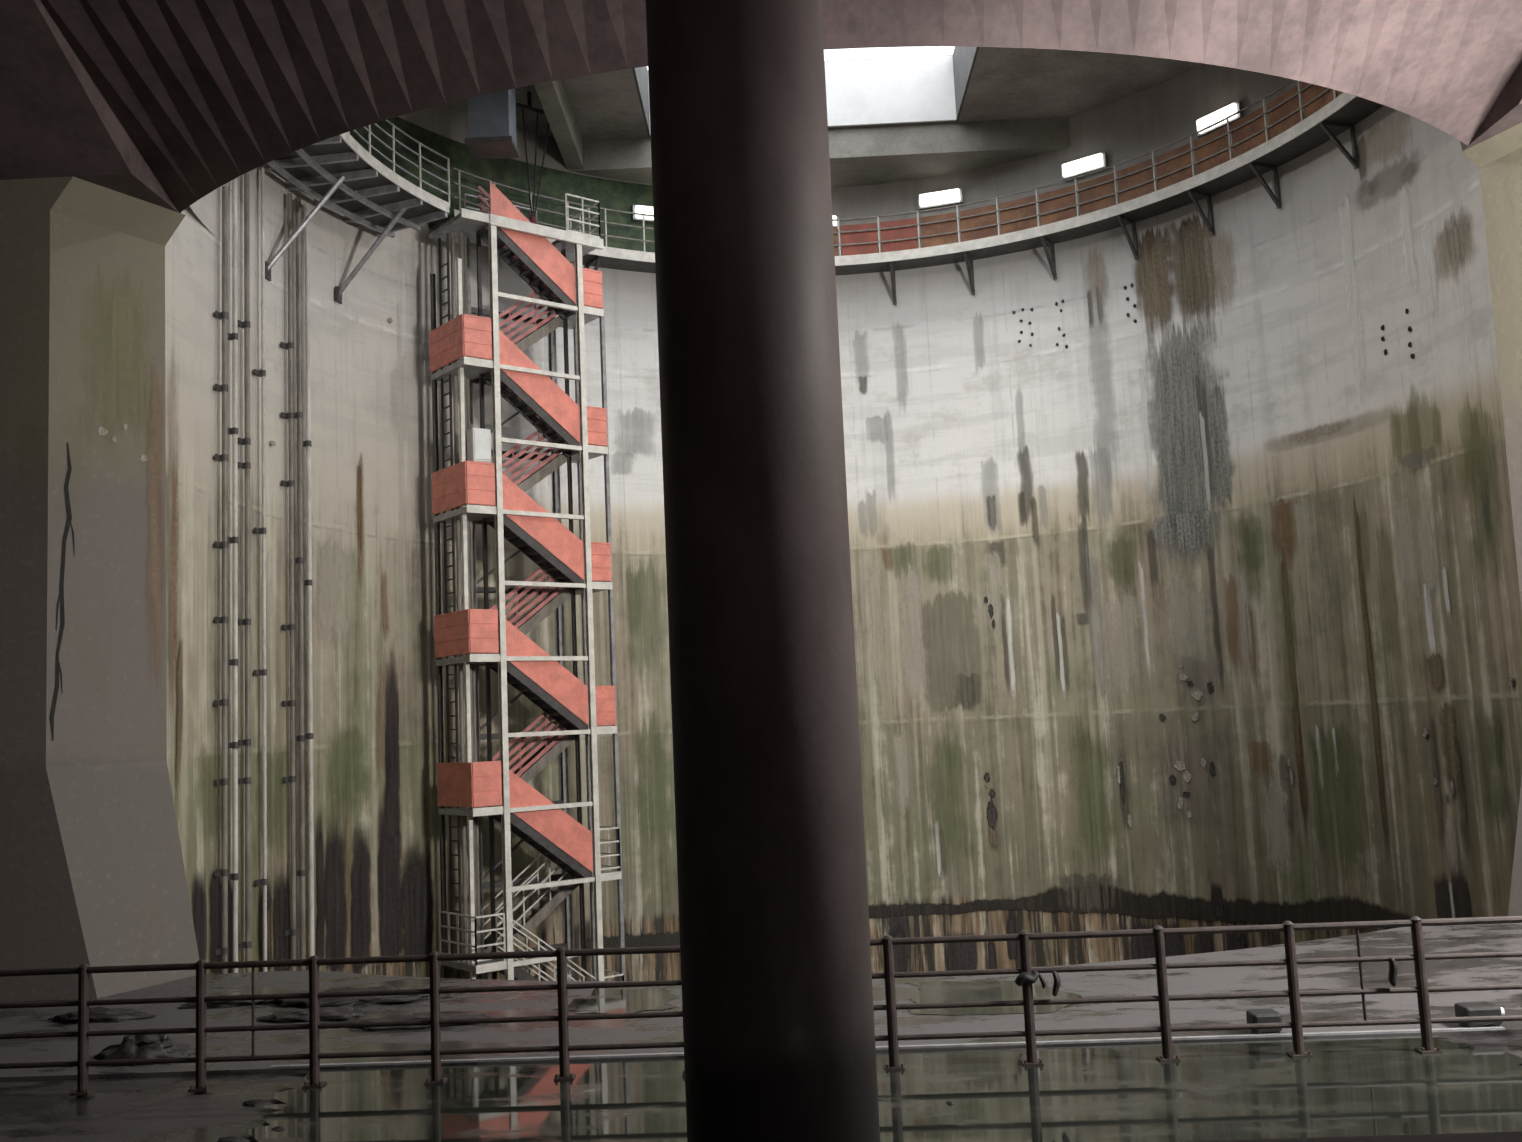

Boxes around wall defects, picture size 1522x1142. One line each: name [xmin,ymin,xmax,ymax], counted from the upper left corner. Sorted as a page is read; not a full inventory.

water stain [1087,254,1105,326]
crack [50,442,75,741]
water stain [317,666,435,972]
water stain [894,735,907,809]
water stain [870,548,978,710]
water stain [987,496,1015,689]
water stain [1051,452,1091,689]
water stain [868,873,1410,972]
water stain [1108,215,1232,693]
rust [1274,499,1309,828]